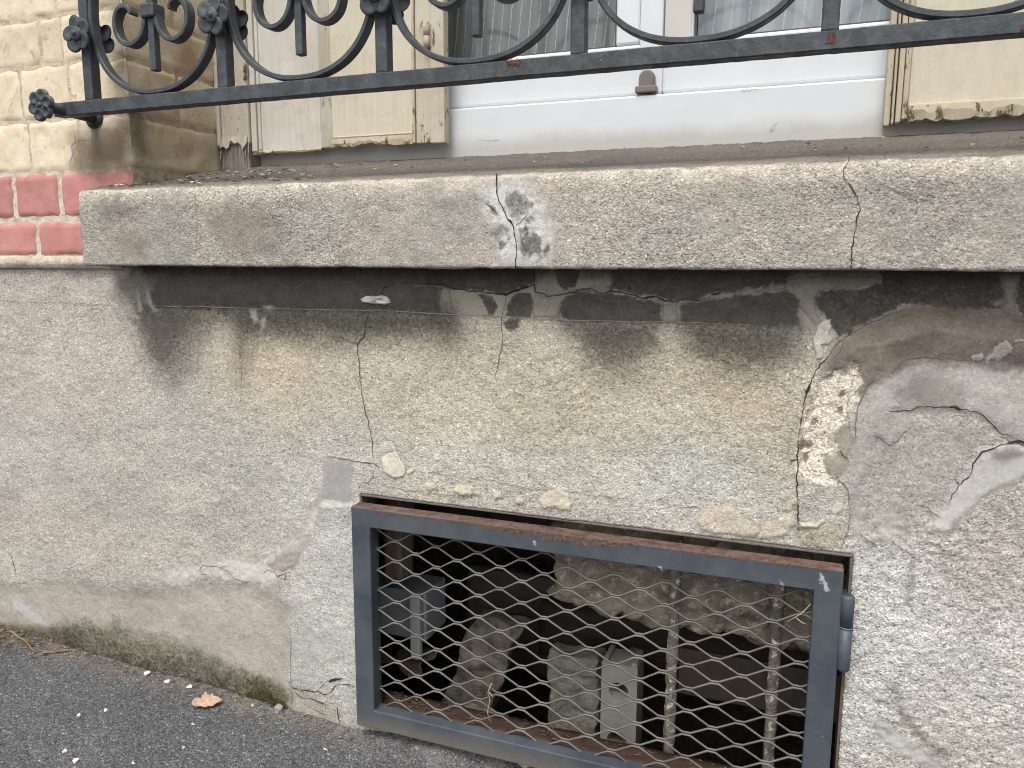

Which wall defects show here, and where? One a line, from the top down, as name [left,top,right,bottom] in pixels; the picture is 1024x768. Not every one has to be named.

crack [843,157,861,270]
damp [121,268,211,372]
damp [504,318,519,331]
crack [318,173,721,508]
damp [532,269,614,317]
damp [697,327,783,359]
peeling [813,319,832,359]
peeling [971,339,1024,363]
spalling [799,362,864,486]
crack [790,308,1024,548]